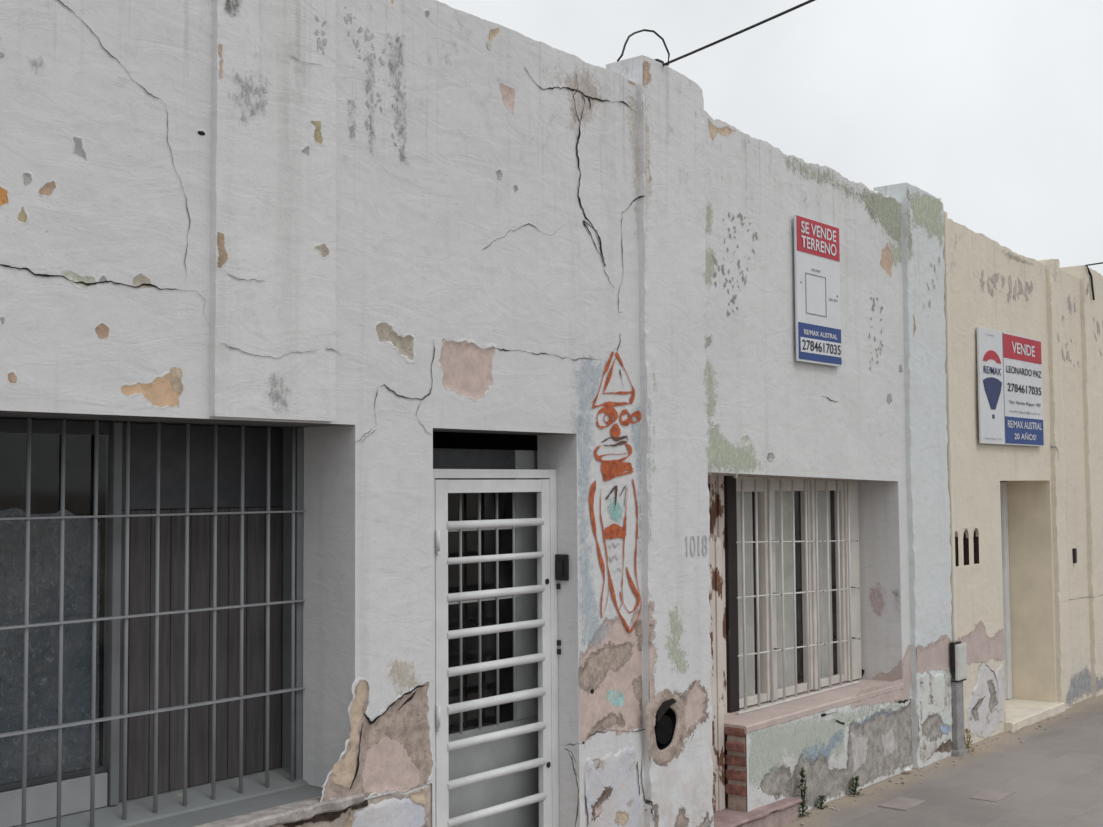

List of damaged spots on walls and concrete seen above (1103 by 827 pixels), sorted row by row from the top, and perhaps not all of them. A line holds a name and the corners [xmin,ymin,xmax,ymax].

crack [0,0,340,359]
crack [482,65,644,360]
peeling [119,366,184,410]
spalling [374,320,417,365]
crack [356,339,435,442]
spalling [438,337,498,403]
spalling [283,677,436,827]
spalling [579,600,710,766]
spalling [760,620,1004,814]